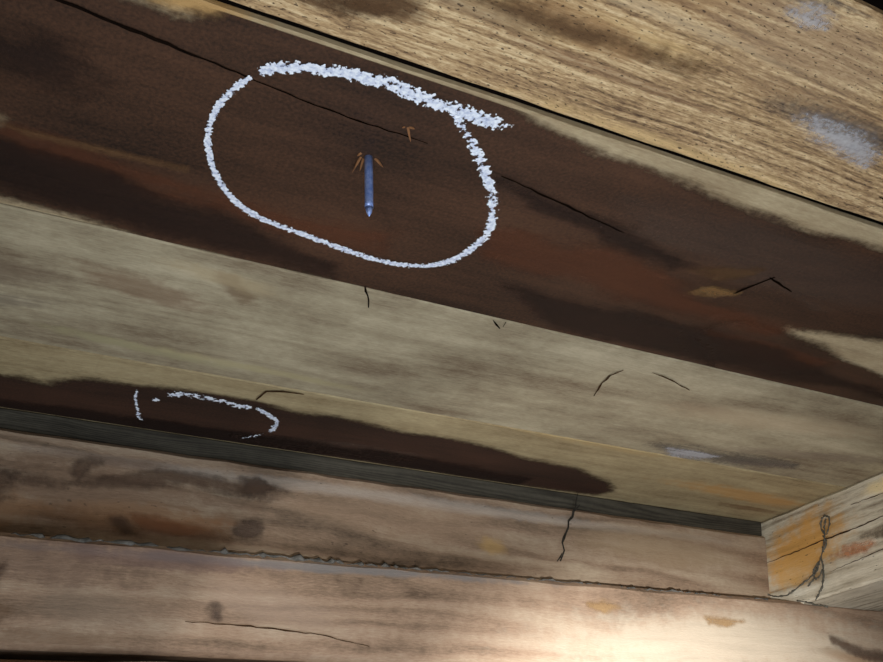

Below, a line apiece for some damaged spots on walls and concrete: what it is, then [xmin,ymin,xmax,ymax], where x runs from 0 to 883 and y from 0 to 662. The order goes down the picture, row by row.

crack [55,0,428,144]
leakage [0,0,883,406]
crack [501,176,624,233]
leakage [0,375,614,495]
crack [557,494,580,562]
crack [767,493,883,563]
crack [185,621,368,646]